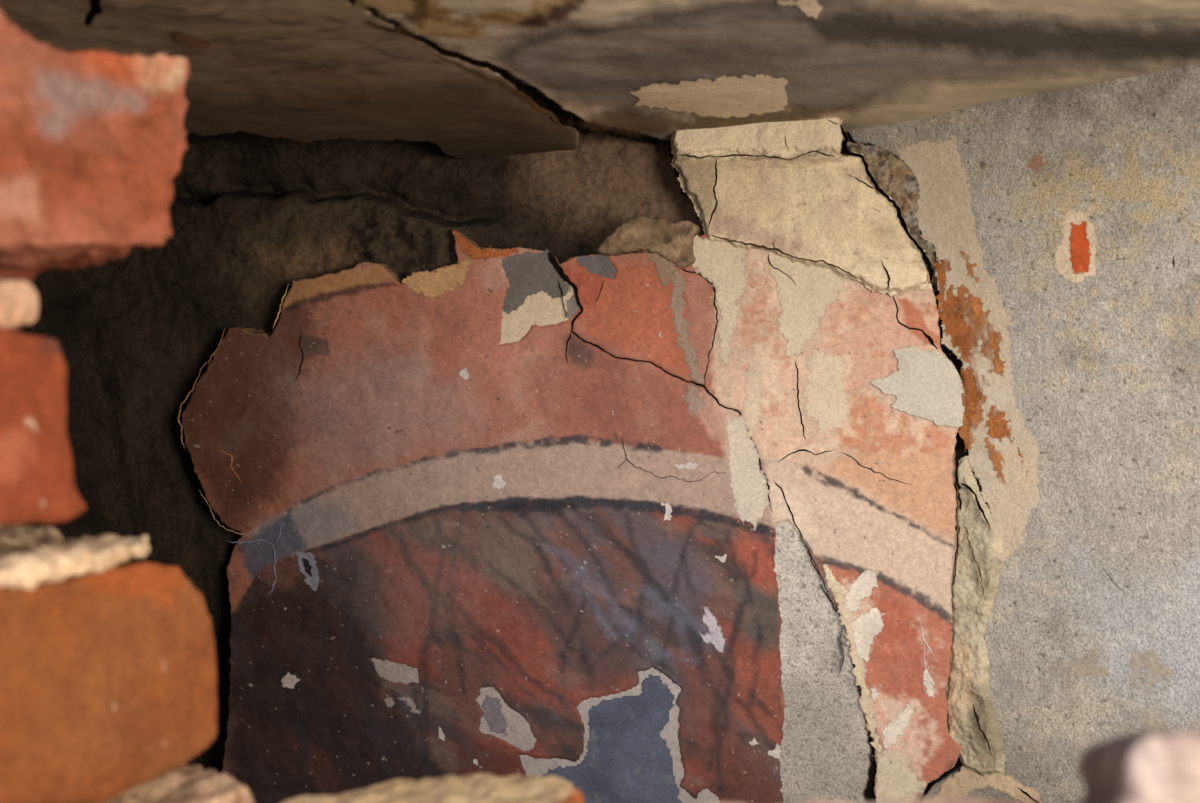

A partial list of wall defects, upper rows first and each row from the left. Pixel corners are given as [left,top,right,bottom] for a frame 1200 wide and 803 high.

spalling [402,230,580,345]
spalling [576,254,617,279]
crack [348,0,938,349]
leakage [361,0,1200,133]
flaking render [629,74,1041,575]
rust [933,251,1022,483]
crack [548,252,908,803]
spalling [476,668,720,803]
spalling [749,521,914,803]